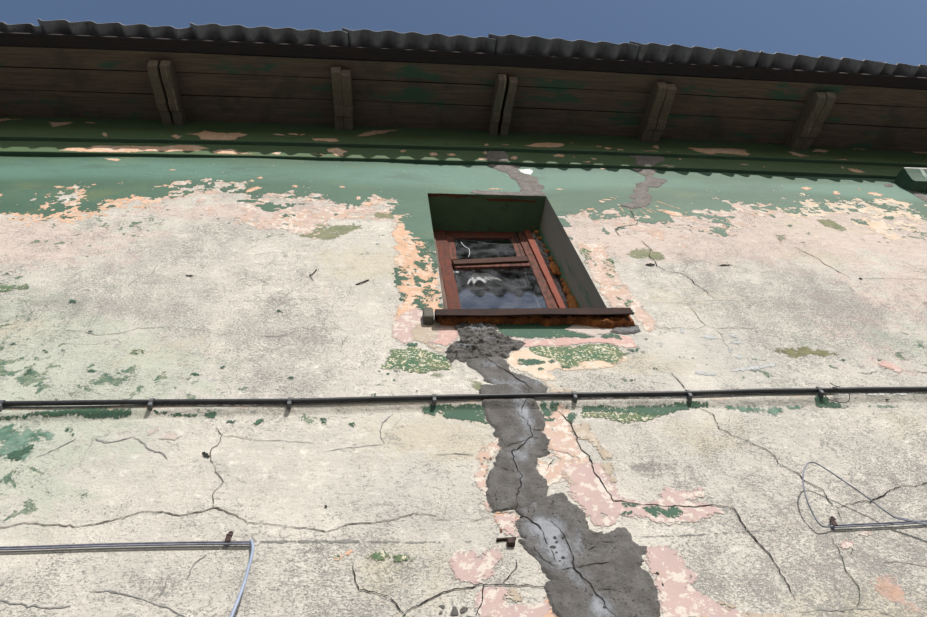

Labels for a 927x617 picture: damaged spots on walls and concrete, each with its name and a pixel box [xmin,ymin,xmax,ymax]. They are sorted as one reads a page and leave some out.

peeling [59,130,250,161]
peeling [273,133,346,156]
peeling [689,147,750,165]
peeling [568,187,927,248]
peeling [0,172,458,353]
crack [616,210,735,343]
peeling [505,242,724,527]
peeling [7,444,34,462]
crack [0,324,927,617]
peeling [474,438,520,537]
peeling [448,547,557,617]
peeling [645,545,788,617]